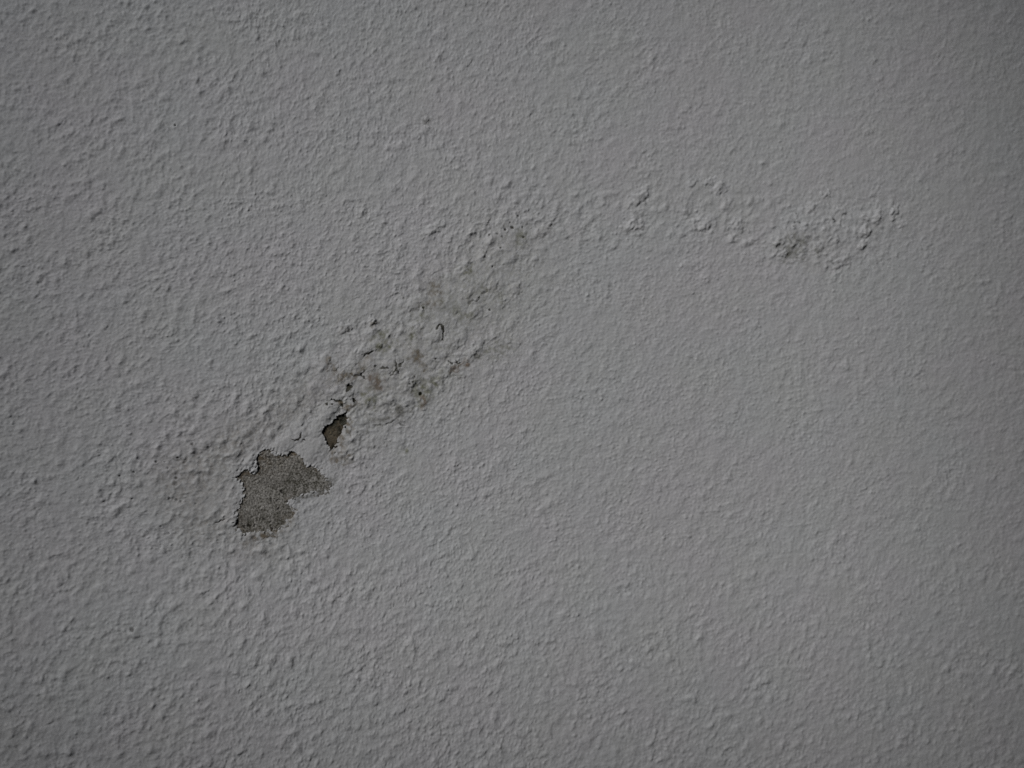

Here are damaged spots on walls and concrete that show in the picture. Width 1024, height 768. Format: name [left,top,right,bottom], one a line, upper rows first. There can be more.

peeling [322,413,348,450]
peeling [235,449,334,538]